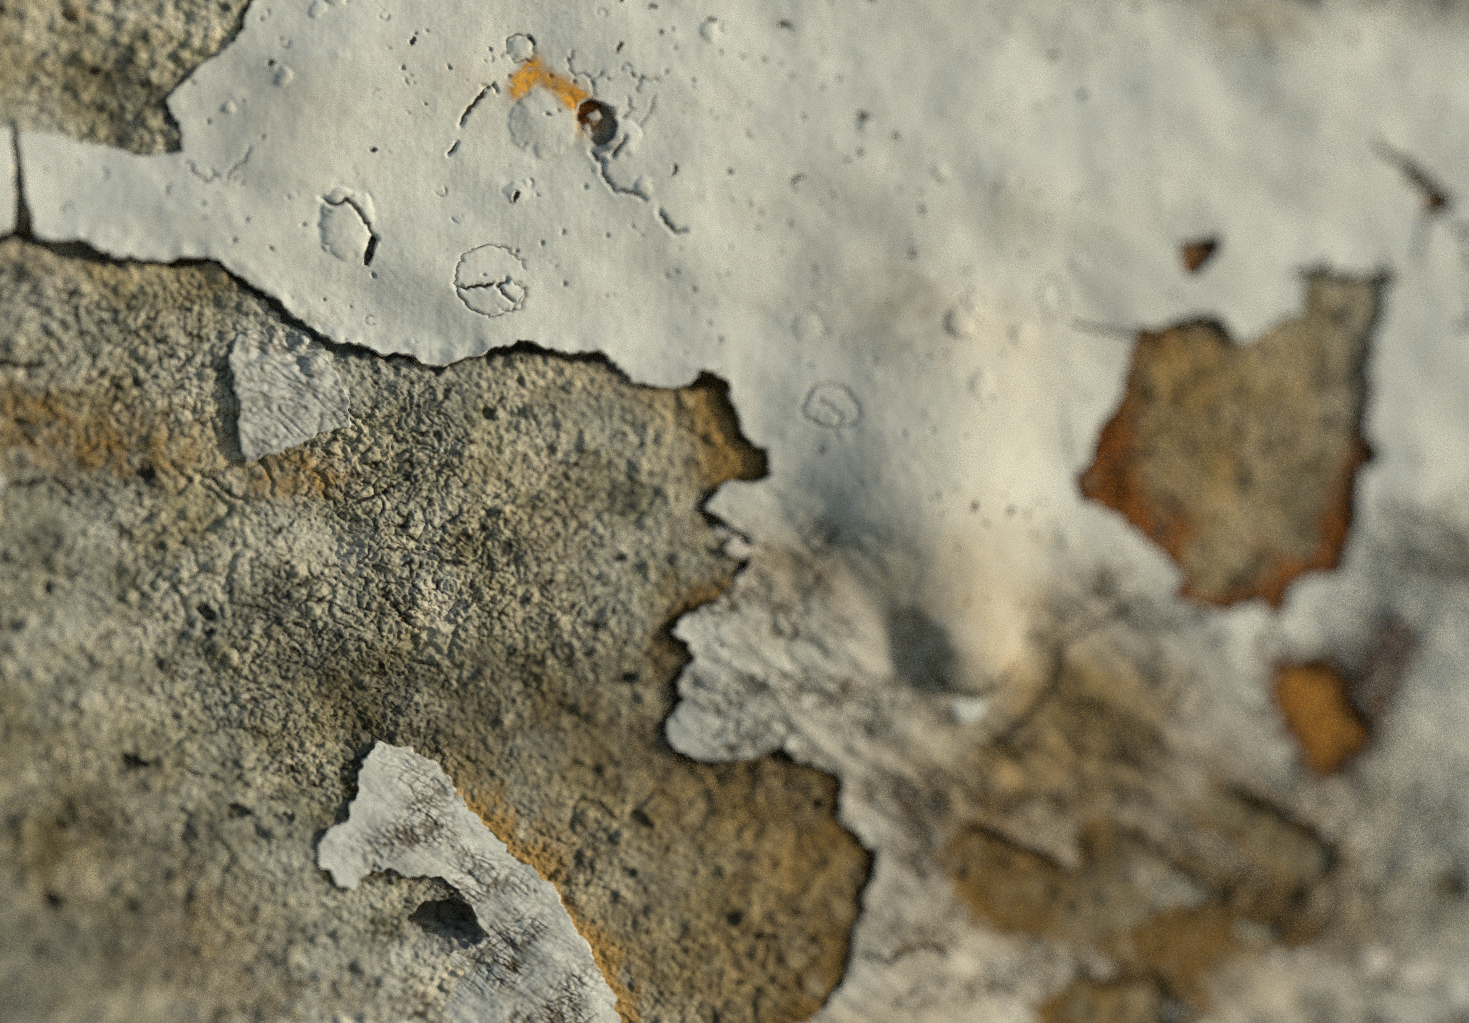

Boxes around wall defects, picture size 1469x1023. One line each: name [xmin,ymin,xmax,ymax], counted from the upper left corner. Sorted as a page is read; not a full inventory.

peeling [0,0,255,156]
corrosion [510,59,600,133]
peeling [1178,233,1223,278]
peeling [1075,253,1402,618]
corrosion [1073,398,1377,616]
peeling [0,228,880,1023]
corrosion [1259,646,1388,786]
peeling [940,824,1309,964]
peeling [1198,786,1342,909]
peeling [1059,969,1179,1023]